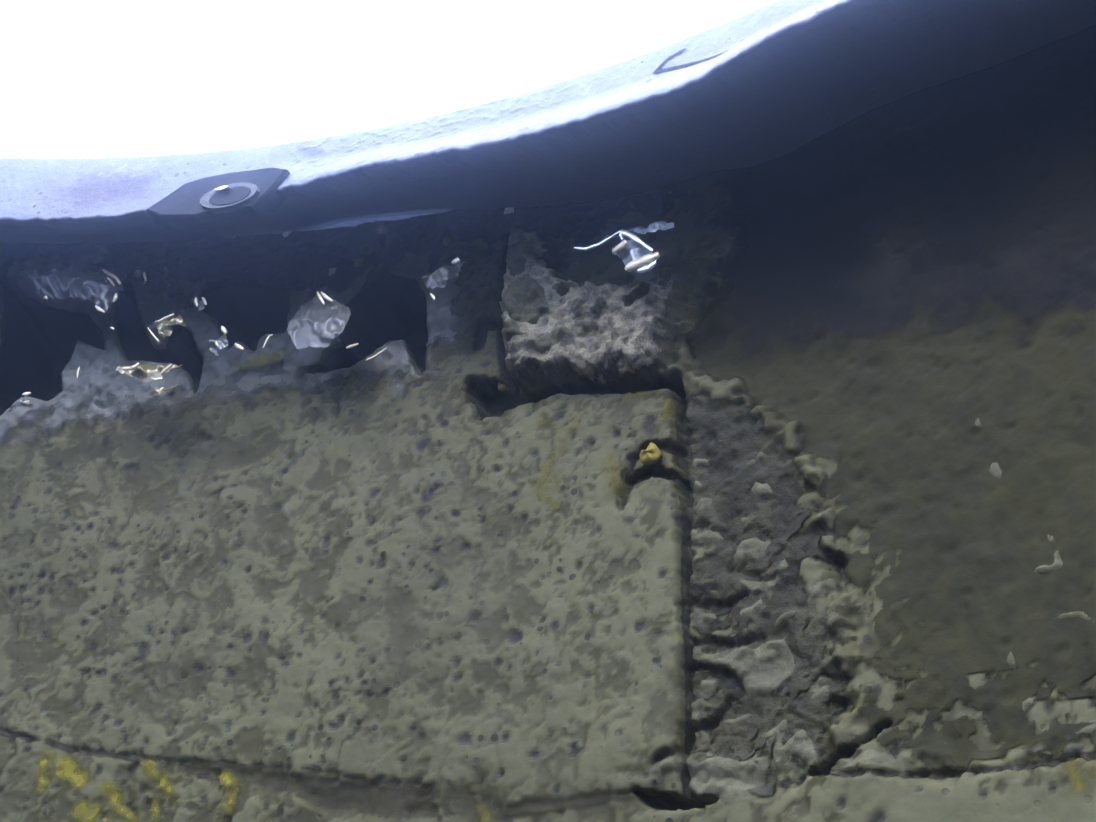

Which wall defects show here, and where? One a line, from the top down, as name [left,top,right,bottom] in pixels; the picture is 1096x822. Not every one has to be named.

spalling [467,226,674,420]
crack [0,247,765,818]
crack [815,725,1096,779]